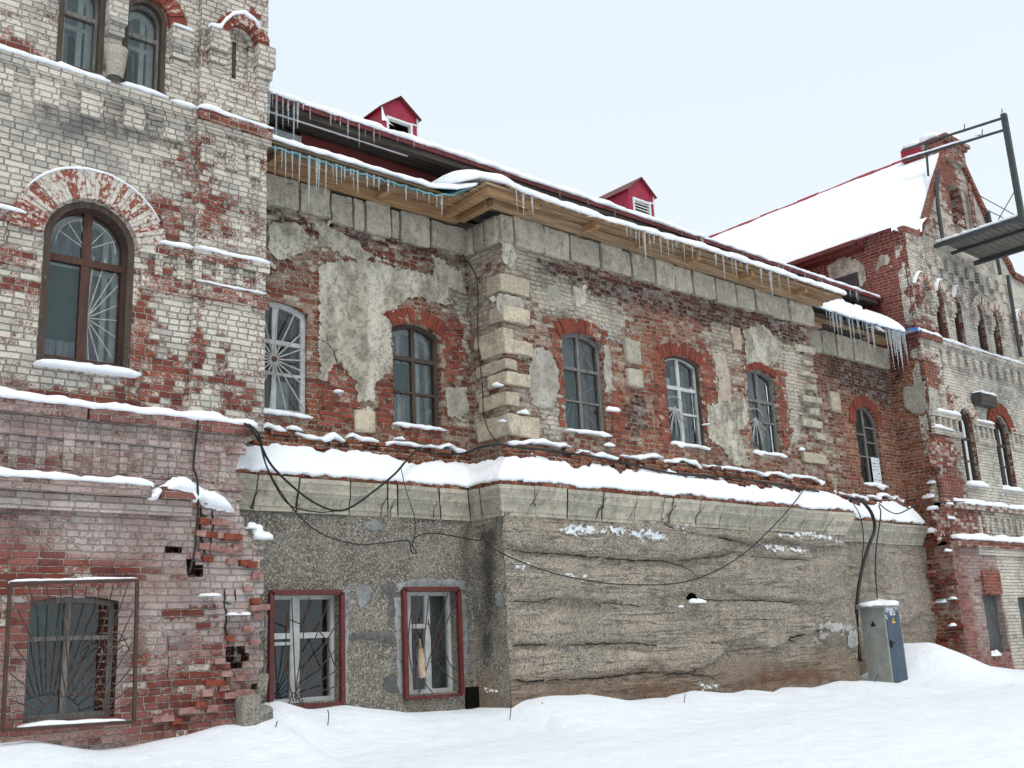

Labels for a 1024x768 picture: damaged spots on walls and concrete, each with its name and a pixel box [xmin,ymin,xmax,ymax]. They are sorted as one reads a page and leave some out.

spalling [160,139,245,244]
peeling [118,208,477,465]
spalling [501,254,909,508]
spalling [931,508,985,544]
spalling [162,605,218,633]
crack [503,537,810,684]
spalling [122,644,240,737]